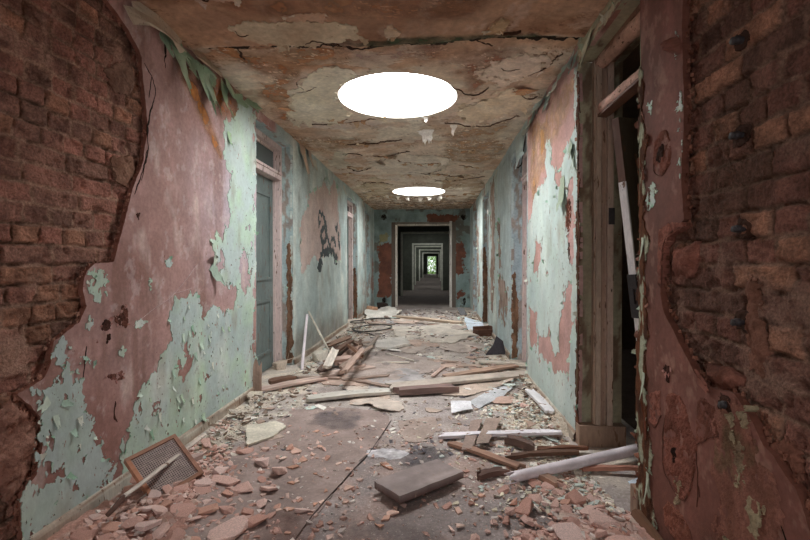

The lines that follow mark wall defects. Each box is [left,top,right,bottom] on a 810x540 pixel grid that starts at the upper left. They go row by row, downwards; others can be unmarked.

crack [135,44,167,193]
peeling [278,66,387,128]
crack [208,36,580,60]
peeling [18,0,262,540]
peeling [286,177,342,363]
peeling [328,0,621,435]
flaking render [630,0,810,517]